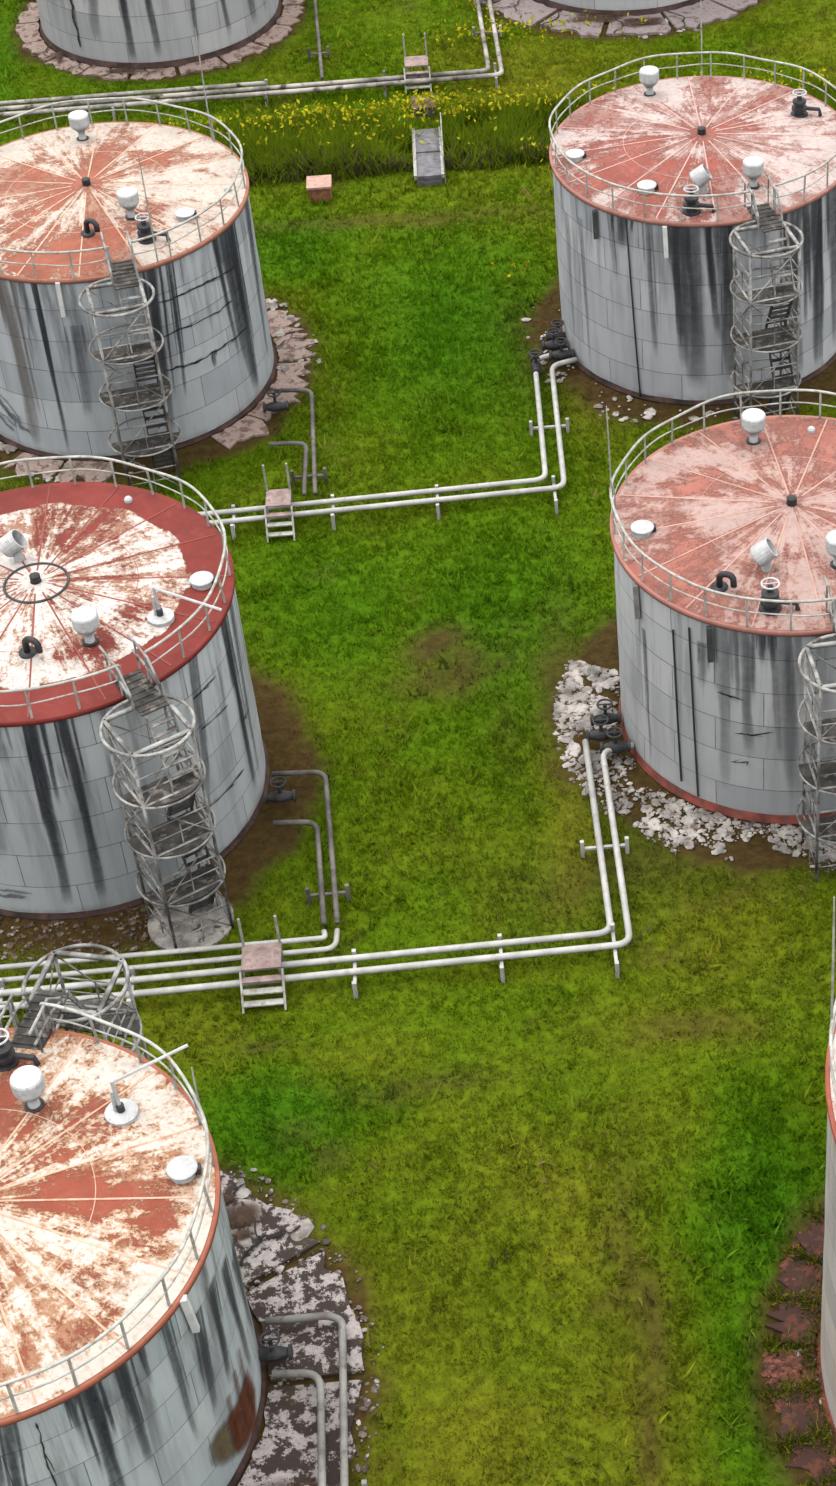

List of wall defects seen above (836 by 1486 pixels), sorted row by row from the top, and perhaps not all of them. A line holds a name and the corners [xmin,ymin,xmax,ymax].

water stain [119,0,133,48]
water stain [0,282,65,432]
water stain [143,262,184,400]
water stain [212,200,263,372]
water stain [669,225,736,354]
water stain [784,189,836,344]
water stain [221,604,253,773]
water stain [22,718,101,889]
water stain [162,1241,248,1398]
crack [35,1423,57,1486]
water stain [65,1352,149,1486]
rust [212,1351,257,1462]